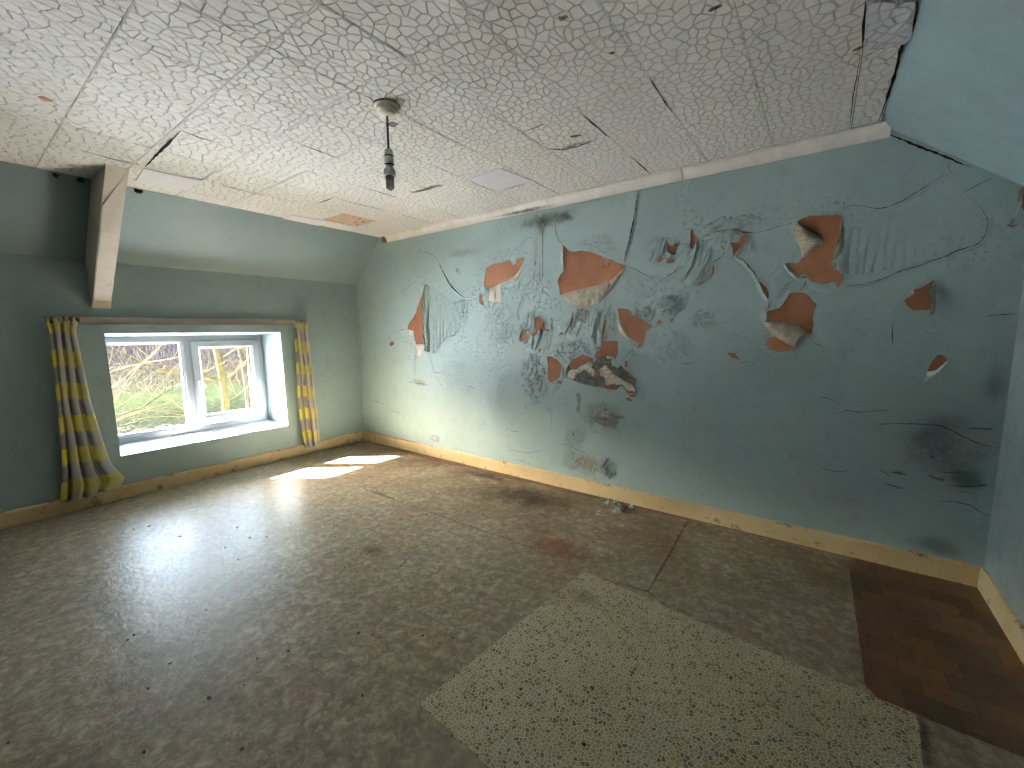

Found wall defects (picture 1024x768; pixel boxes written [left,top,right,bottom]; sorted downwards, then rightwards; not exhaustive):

crack [85,130,217,167]
peeling [405,281,460,357]
peeling [477,253,538,307]
water stain [512,206,567,276]
peeling [519,239,676,403]
crack [624,157,685,284]
peeling [656,225,756,265]
peeling [756,206,854,357]
peeling [898,276,943,316]
peeling [922,351,953,382]